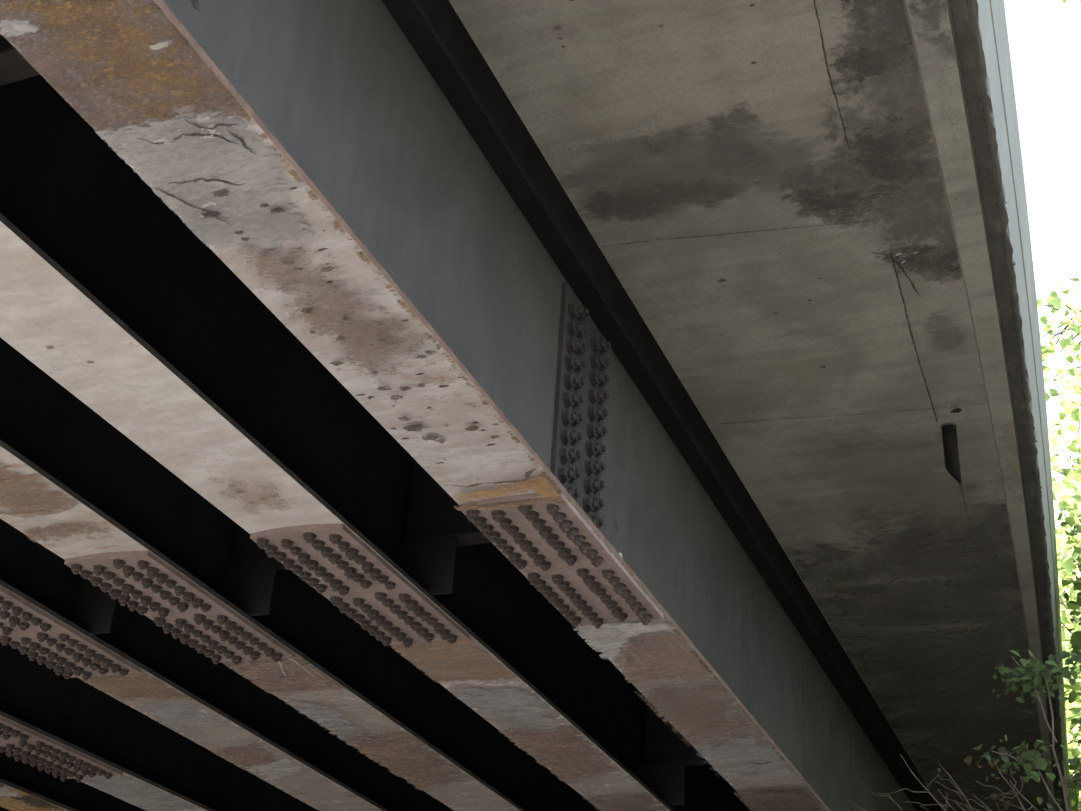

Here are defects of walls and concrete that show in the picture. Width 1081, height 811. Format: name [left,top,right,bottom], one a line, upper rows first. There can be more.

rust [0,0,255,133]
crack [814,0,850,149]
water stain [781,0,972,281]
rust [236,134,489,405]
crack [714,252,978,425]
rust [0,467,104,543]
rust [453,455,570,511]